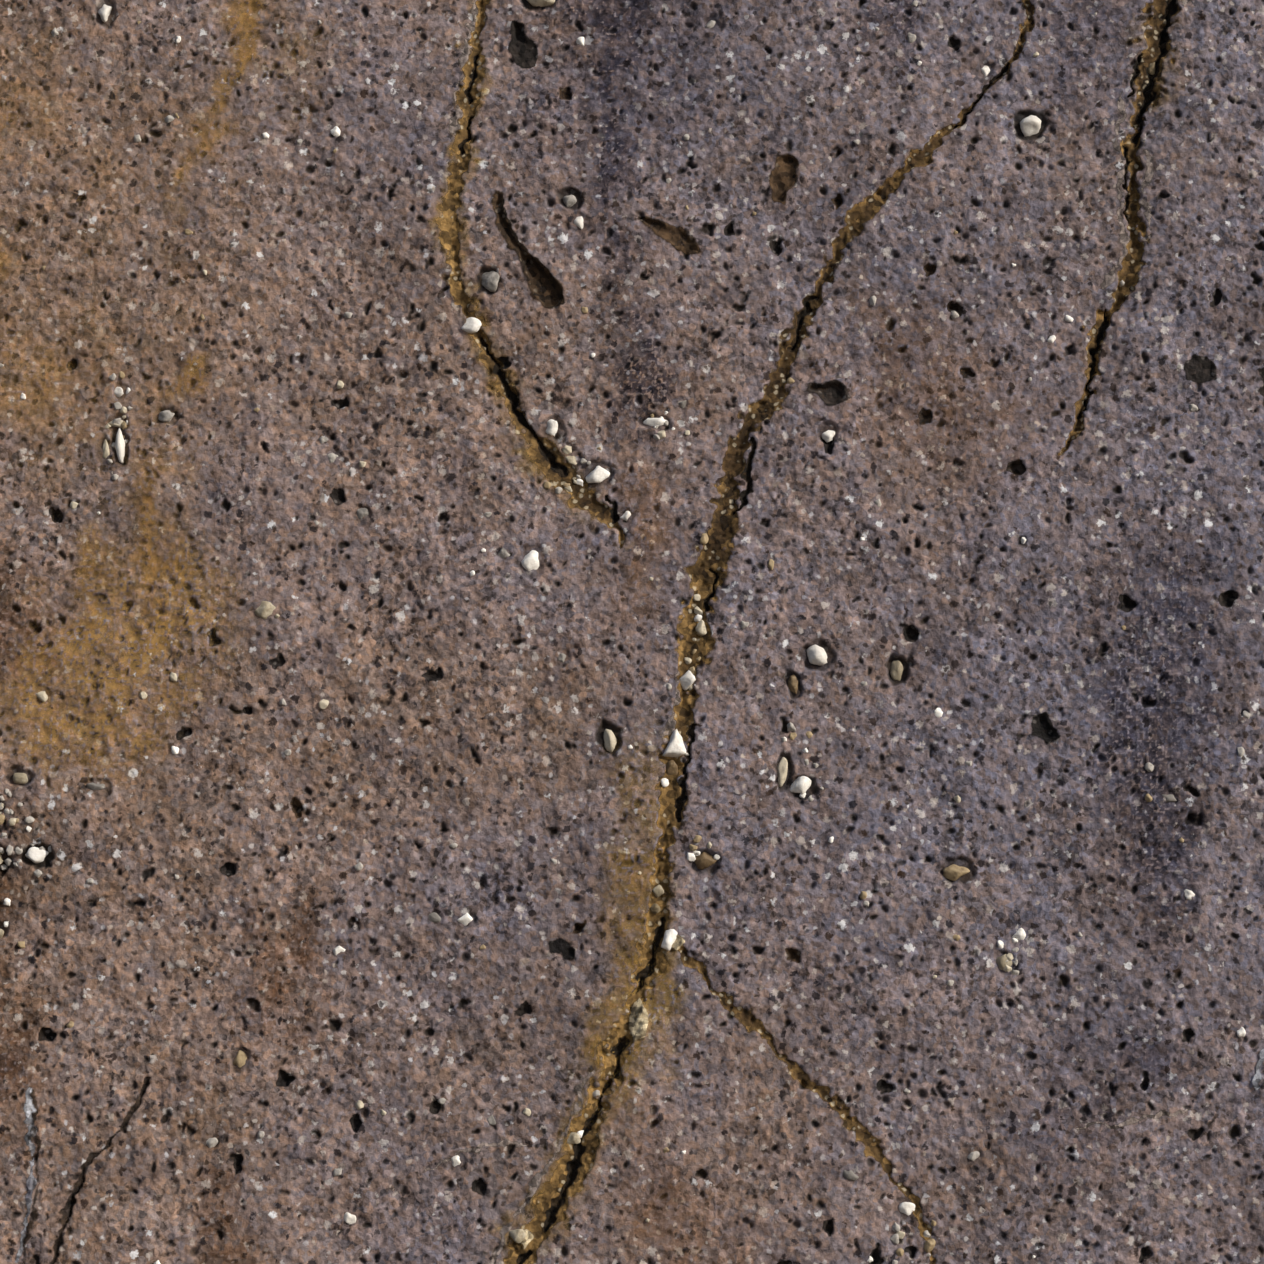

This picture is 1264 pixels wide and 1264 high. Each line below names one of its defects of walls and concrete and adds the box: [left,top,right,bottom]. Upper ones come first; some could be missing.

crack [435,0,625,549]
crack [1057,0,1181,456]
crack [488,0,1035,1264]
crack [50,1077,151,1264]
spalling [1252,1049,1264,1090]